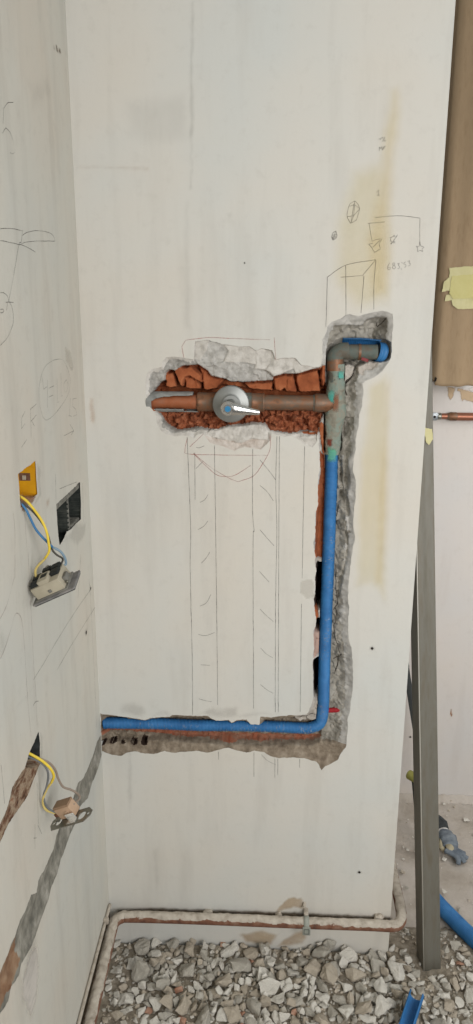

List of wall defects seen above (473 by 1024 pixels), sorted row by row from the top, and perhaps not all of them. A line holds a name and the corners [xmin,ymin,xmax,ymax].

spalling [145,311,393,451]
spalling [28,732,40,759]